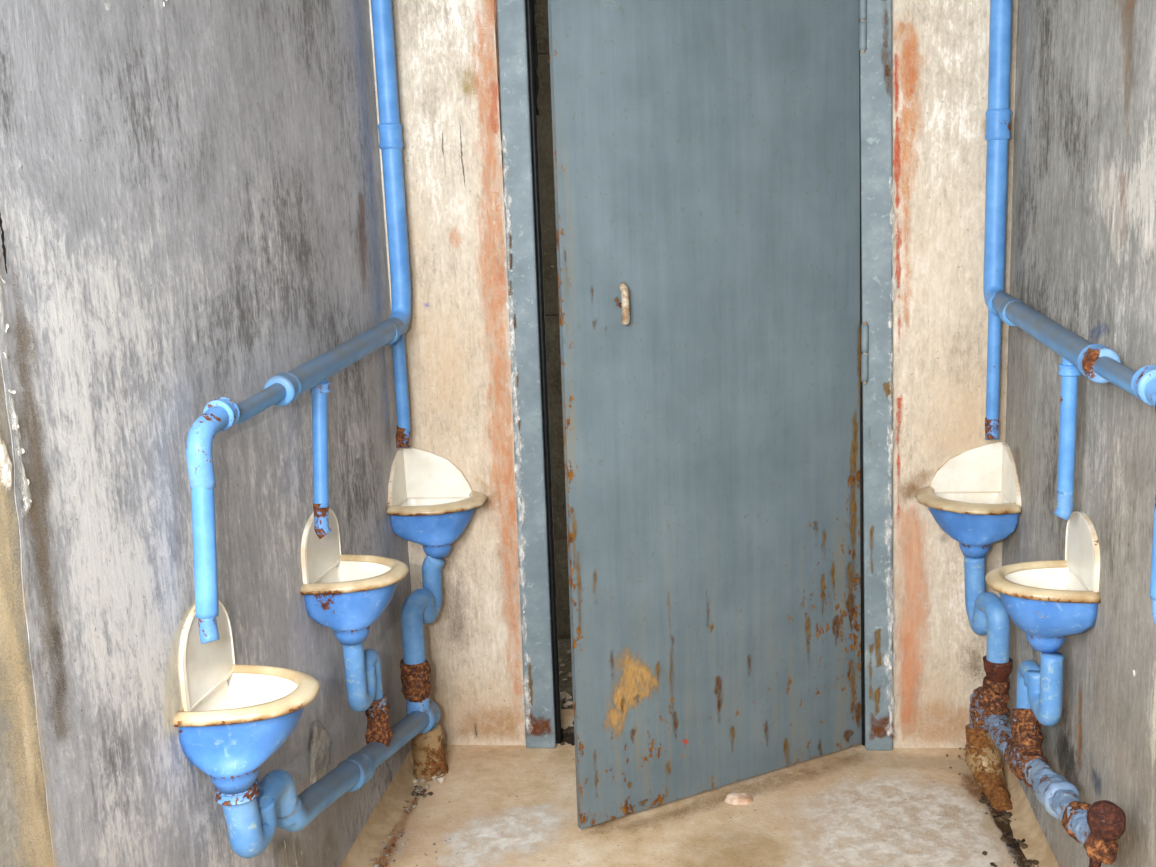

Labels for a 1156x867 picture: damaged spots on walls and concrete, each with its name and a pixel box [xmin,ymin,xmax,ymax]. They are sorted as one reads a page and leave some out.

crack [0,213,8,273]
corrosion [466,0,555,738]
corrosion [892,13,929,350]